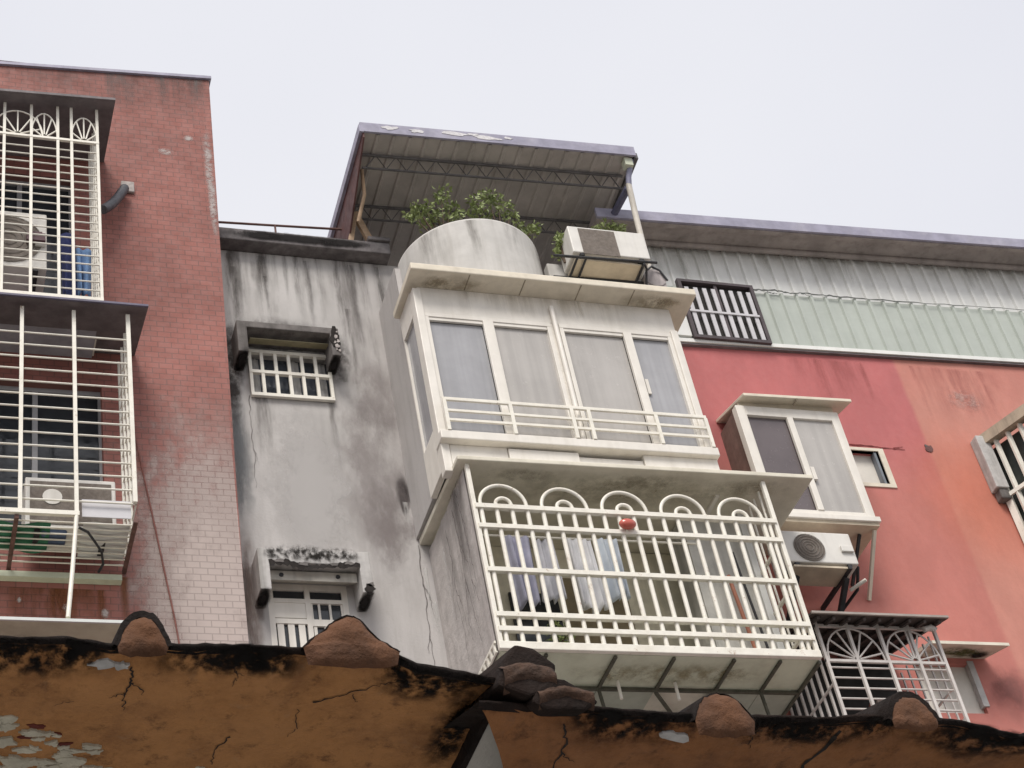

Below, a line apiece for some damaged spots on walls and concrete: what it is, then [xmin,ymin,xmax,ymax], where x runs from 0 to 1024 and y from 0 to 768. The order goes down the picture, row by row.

peeling [442,131,513,141]
damp [227,332,248,407]
damp [267,548,351,560]
crack [418,494,482,666]
damp [358,593,373,611]
damp [0,640,103,675]
peeling [87,658,130,671]
crack [111,667,144,709]
crack [287,682,395,737]
peeling [0,715,112,768]
crack [553,724,574,768]
peeling [659,730,689,743]